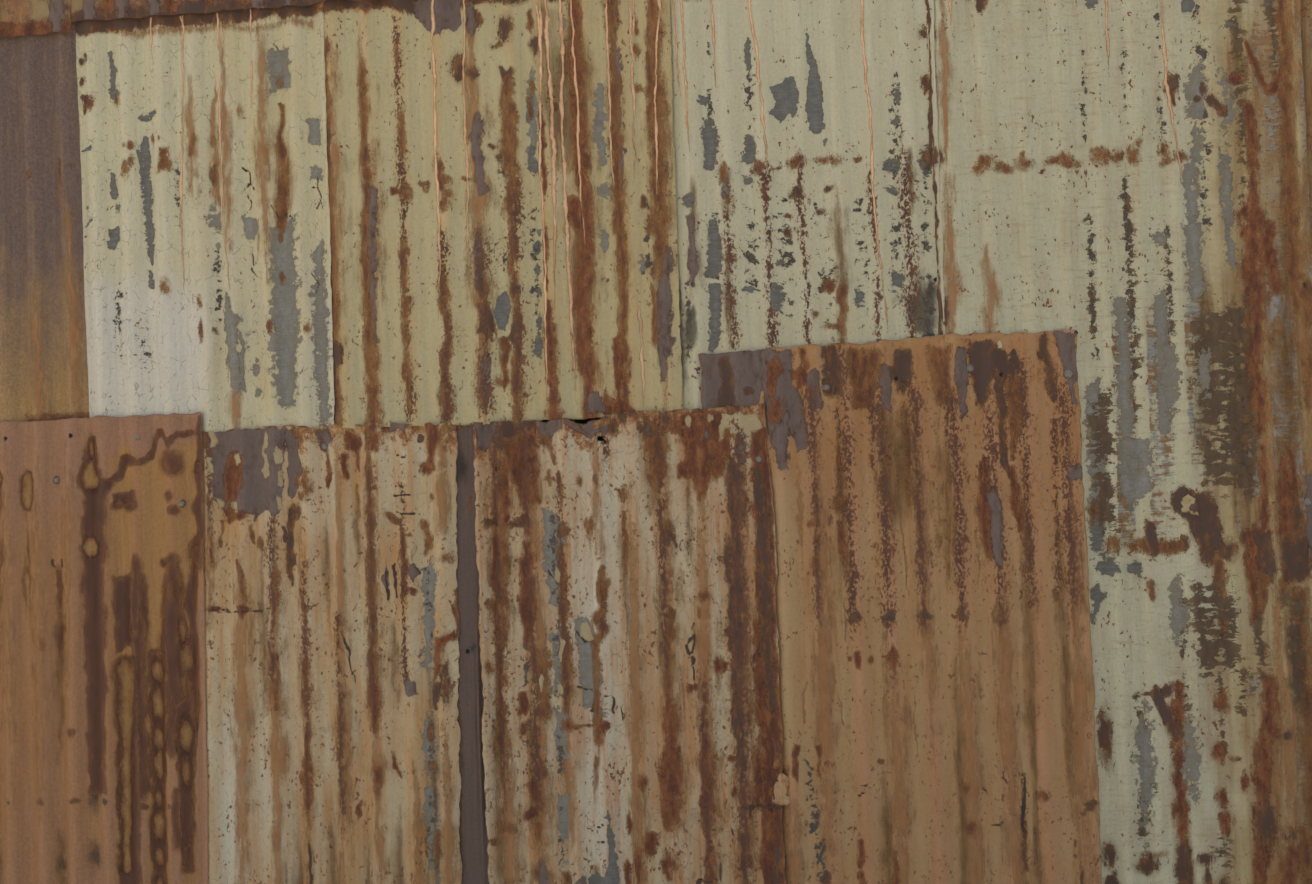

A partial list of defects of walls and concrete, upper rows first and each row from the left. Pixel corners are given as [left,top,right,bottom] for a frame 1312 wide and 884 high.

peeling [107,51,118,100]
peeling [264,47,292,97]
peeling [107,226,123,256]
peeling [136,110,156,289]
peeling [203,201,224,344]
peeling [241,215,333,453]
peeling [637,33,937,480]
peeling [206,427,303,522]
peeling [521,495,610,776]
peeling [574,810,620,884]
peeling [1130,682,1158,852]
peeling [1167,573,1312,804]